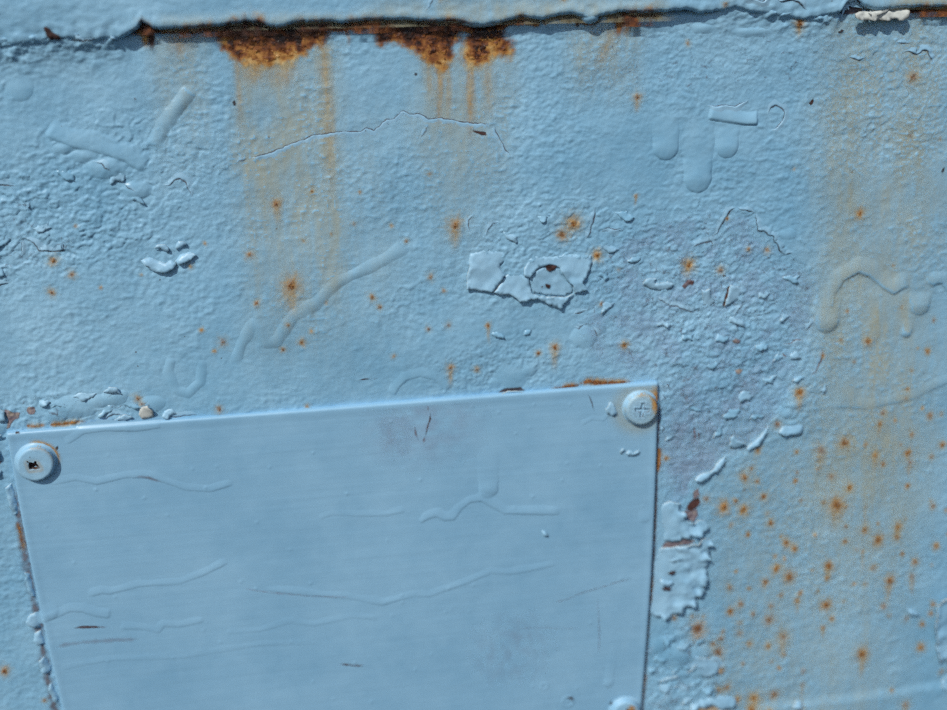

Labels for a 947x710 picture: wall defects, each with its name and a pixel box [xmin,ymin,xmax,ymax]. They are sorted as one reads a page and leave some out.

corrosion [134,8,662,114]
crack [236,111,510,163]
peeling [141,241,196,274]
peeling [466,250,609,309]
peeling [643,272,741,306]
peeling [73,387,176,421]
peeling [0,400,66,473]
corrosion [720,500,747,515]
corrosion [830,484,853,511]
peeling [648,369,803,710]
corrosion [763,535,797,586]